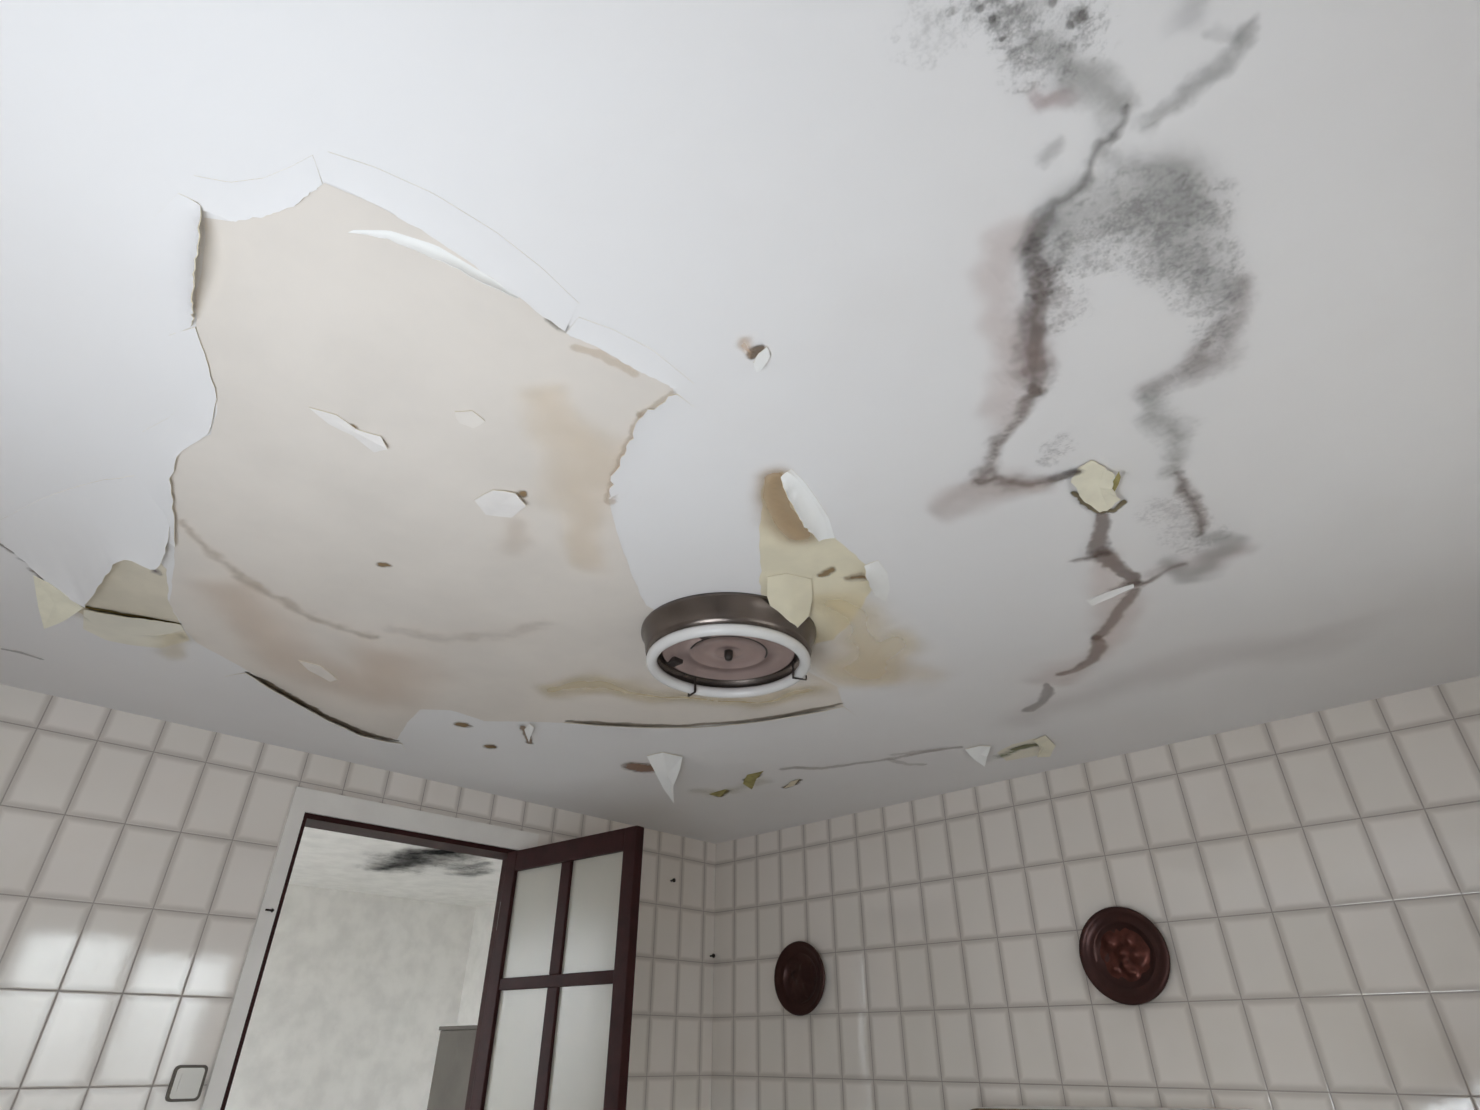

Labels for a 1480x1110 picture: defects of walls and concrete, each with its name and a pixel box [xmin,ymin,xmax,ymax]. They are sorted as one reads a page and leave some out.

peeling [0,152,855,803]
peeling [759,469,890,644]
peeling [1071,460,1127,514]